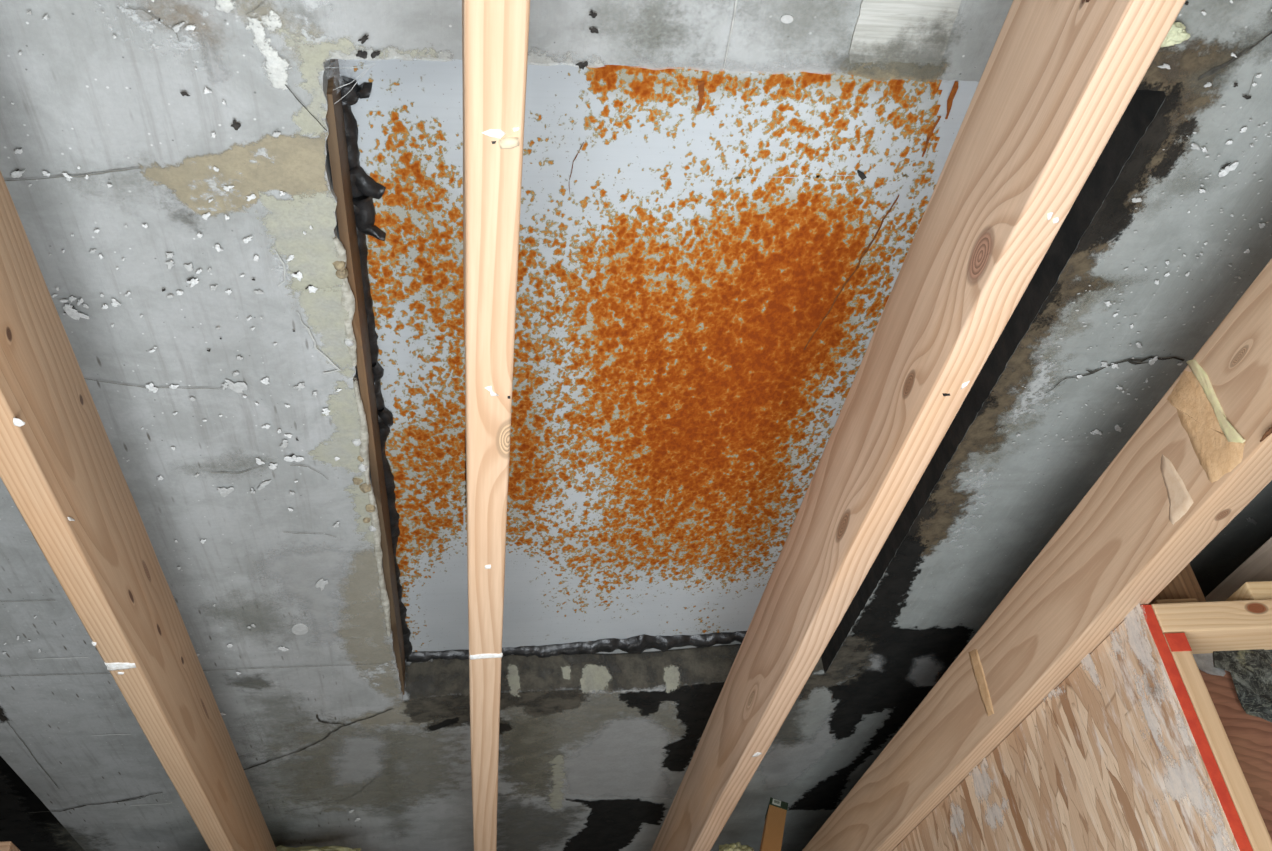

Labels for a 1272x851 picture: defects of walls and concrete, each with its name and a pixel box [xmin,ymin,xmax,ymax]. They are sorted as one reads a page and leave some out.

spalling [197,186,234,238]
corrosion [354,62,467,652]
corrosion [506,65,958,633]
crack [1046,356,1185,393]
crack [244,709,392,770]
water stain [496,682,724,851]